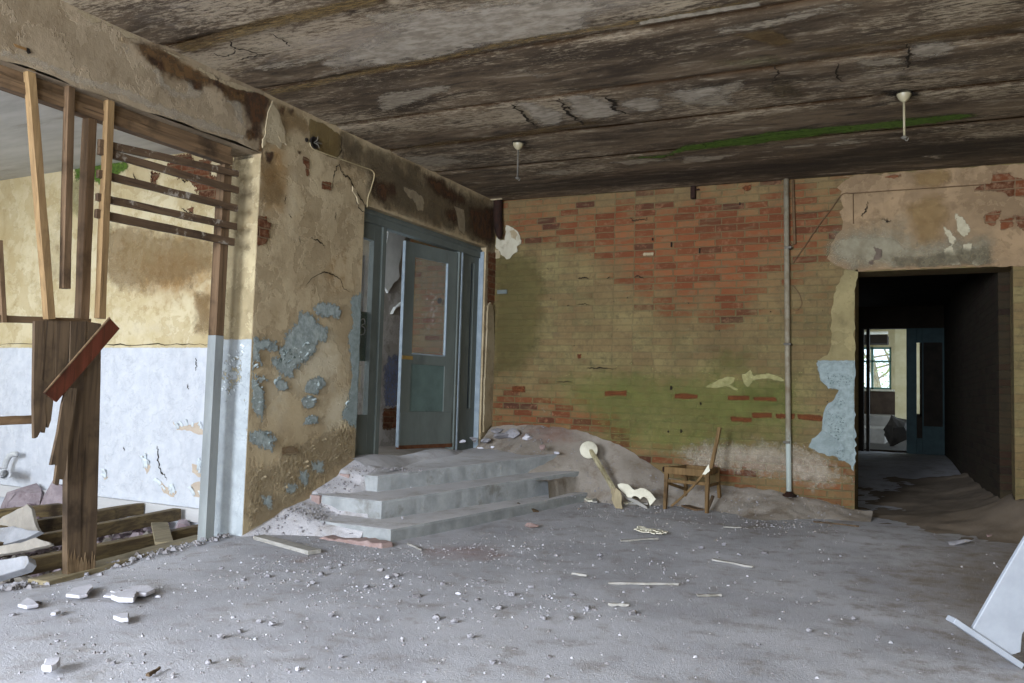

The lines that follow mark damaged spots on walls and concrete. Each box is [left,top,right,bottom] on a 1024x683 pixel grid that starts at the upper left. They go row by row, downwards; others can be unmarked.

crack [511,104,538,128]
crack [557,98,585,126]
crack [605,96,626,114]
crack [332,139,365,219]
flaking render [974,172,1024,197]
flaking render [257,215,272,247]
spalling [943,213,977,266]
flaking render [983,210,1024,231]
peeling [487,225,522,305]
peeling [235,292,362,527]
peeling [675,361,855,462]
peeling [140,452,201,497]